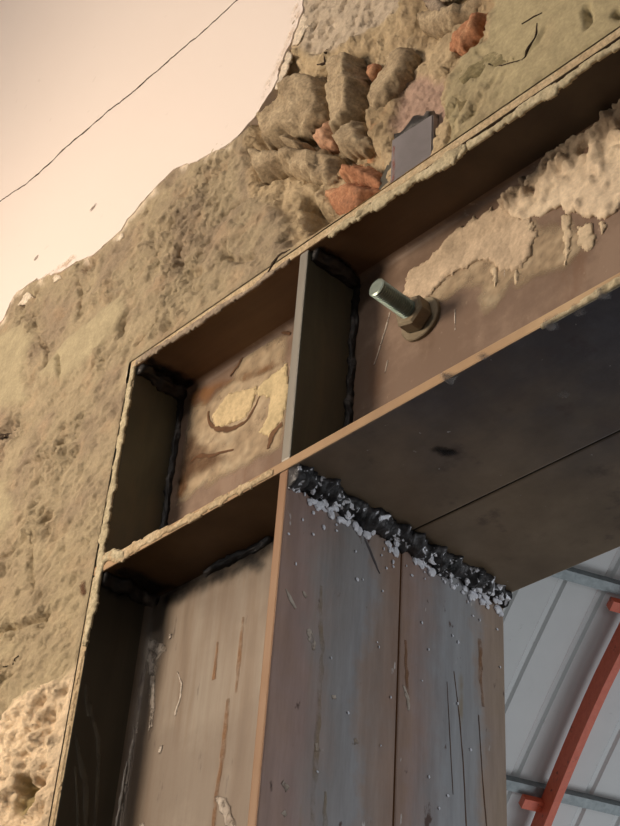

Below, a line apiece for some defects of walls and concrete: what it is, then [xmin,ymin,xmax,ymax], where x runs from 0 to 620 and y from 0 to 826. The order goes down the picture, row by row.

crack [0,0,237,202]
spalling [244,0,514,247]
crack [488,12,542,67]
crack [268,249,290,272]
flaking render [0,668,76,826]